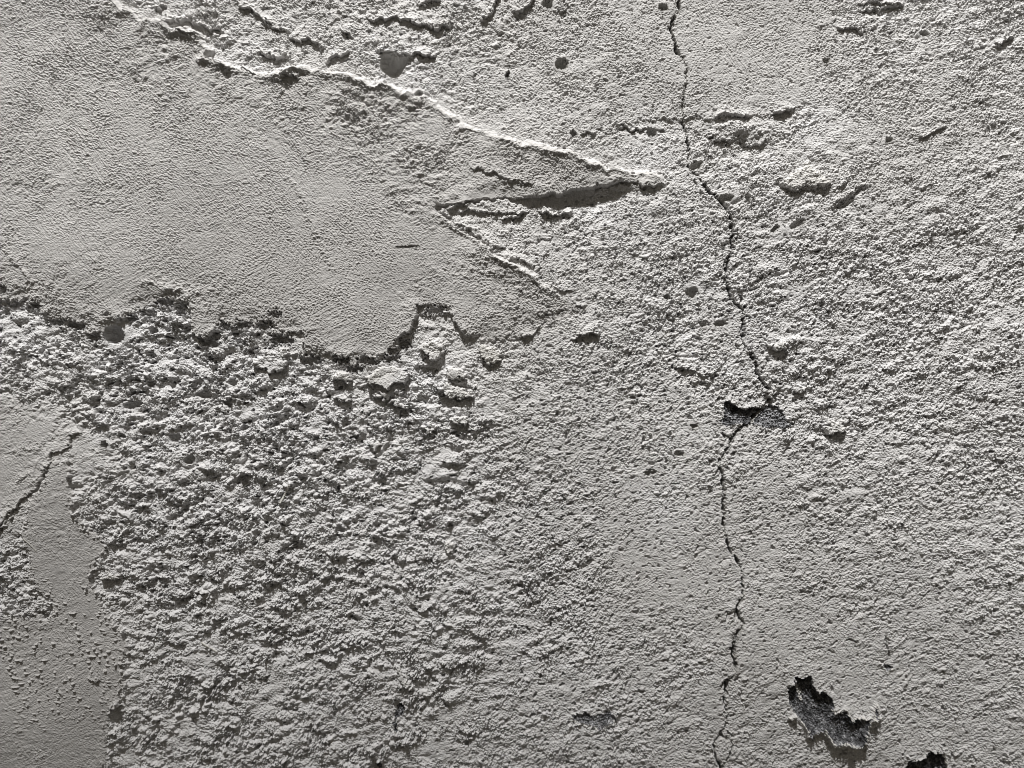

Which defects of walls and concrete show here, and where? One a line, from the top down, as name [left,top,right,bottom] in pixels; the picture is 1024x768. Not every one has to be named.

flaking render [0,294,507,485]
crack [668,0,776,768]
peeling [720,401,791,429]
crack [0,431,84,533]
peeling [389,701,405,737]
peeling [788,675,882,753]
peeling [906,751,949,768]